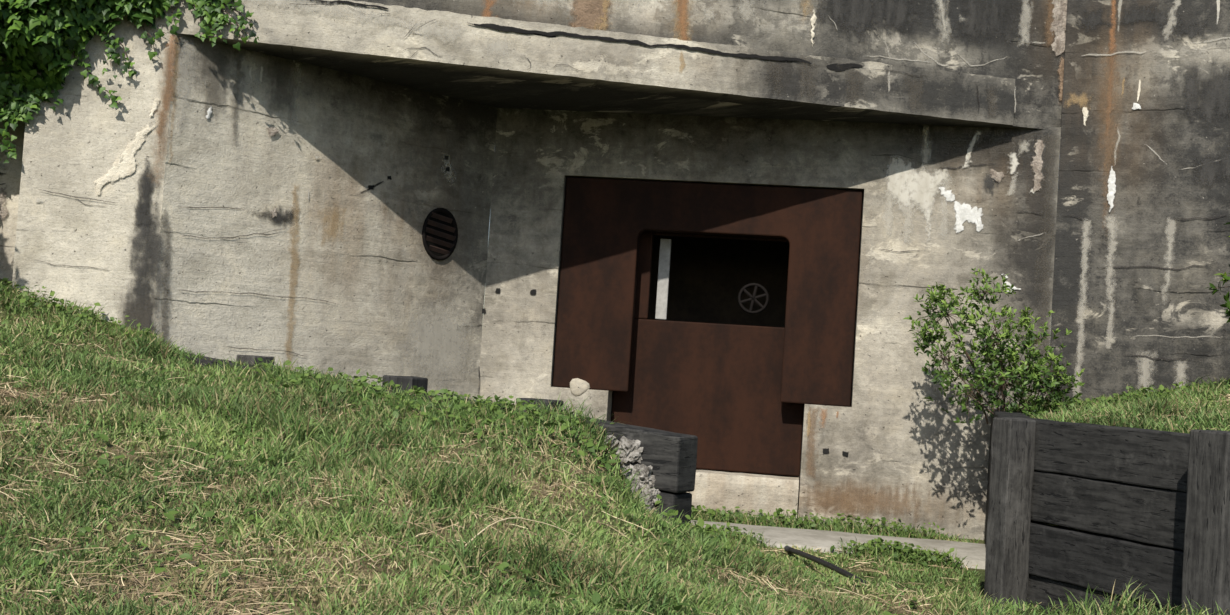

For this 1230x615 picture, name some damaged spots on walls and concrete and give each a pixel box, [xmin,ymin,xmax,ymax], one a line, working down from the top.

rust [158,35,174,158]
crack [290,0,442,58]
crack [468,22,1004,111]
crack [939,0,947,31]
rust [1102,0,1122,171]
leakage [1077,0,1228,43]
leakage [1185,70,1230,123]
peeling [94,98,159,195]
leakage [124,159,165,334]
peeling [939,187,983,233]